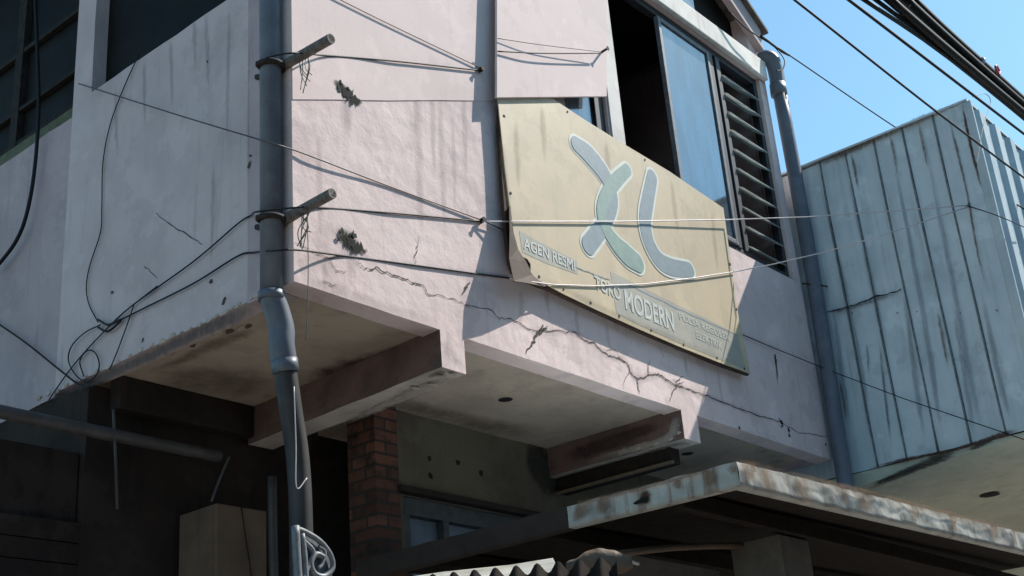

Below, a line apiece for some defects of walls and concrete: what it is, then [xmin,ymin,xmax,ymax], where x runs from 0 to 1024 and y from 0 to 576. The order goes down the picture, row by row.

spalling [335,80,362,106]
spalling [337,228,366,254]
crack [295,237,827,437]
leakage [878,452,953,484]
corrosion [573,471,715,520]